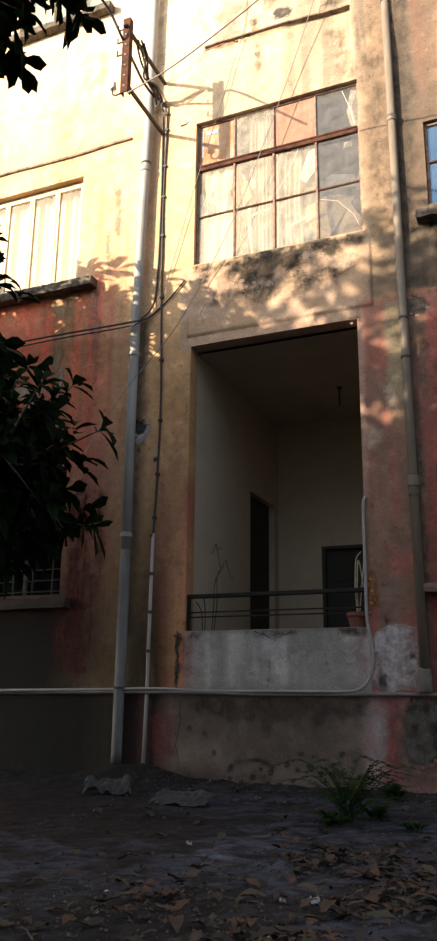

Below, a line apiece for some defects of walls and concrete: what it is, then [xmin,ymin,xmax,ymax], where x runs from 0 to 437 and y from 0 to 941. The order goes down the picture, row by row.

damp [195,230,364,304]
spalling [135,416,151,444]
peeling [372,624,437,771]